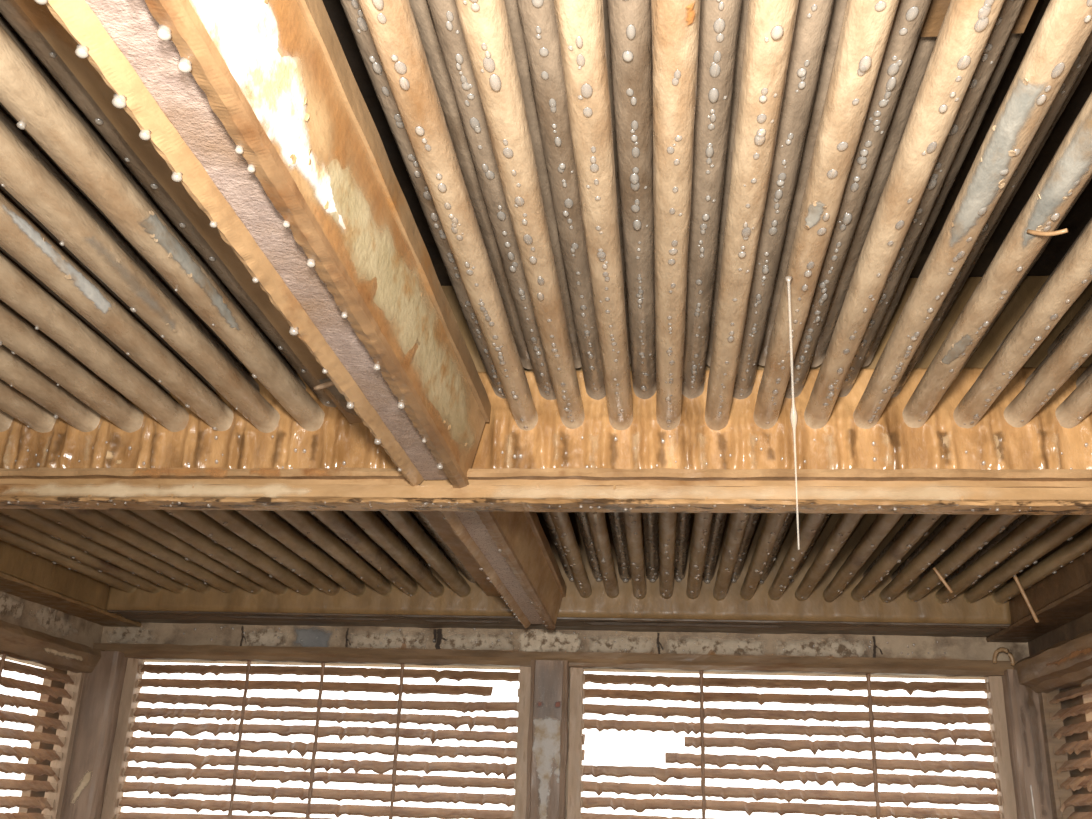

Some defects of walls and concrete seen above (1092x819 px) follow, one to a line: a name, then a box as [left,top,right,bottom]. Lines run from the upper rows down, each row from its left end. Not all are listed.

peeling [950,78,1044,246]
peeling [1023,111,1092,246]
peeling [3,206,111,313]
peeling [532,719,561,819]